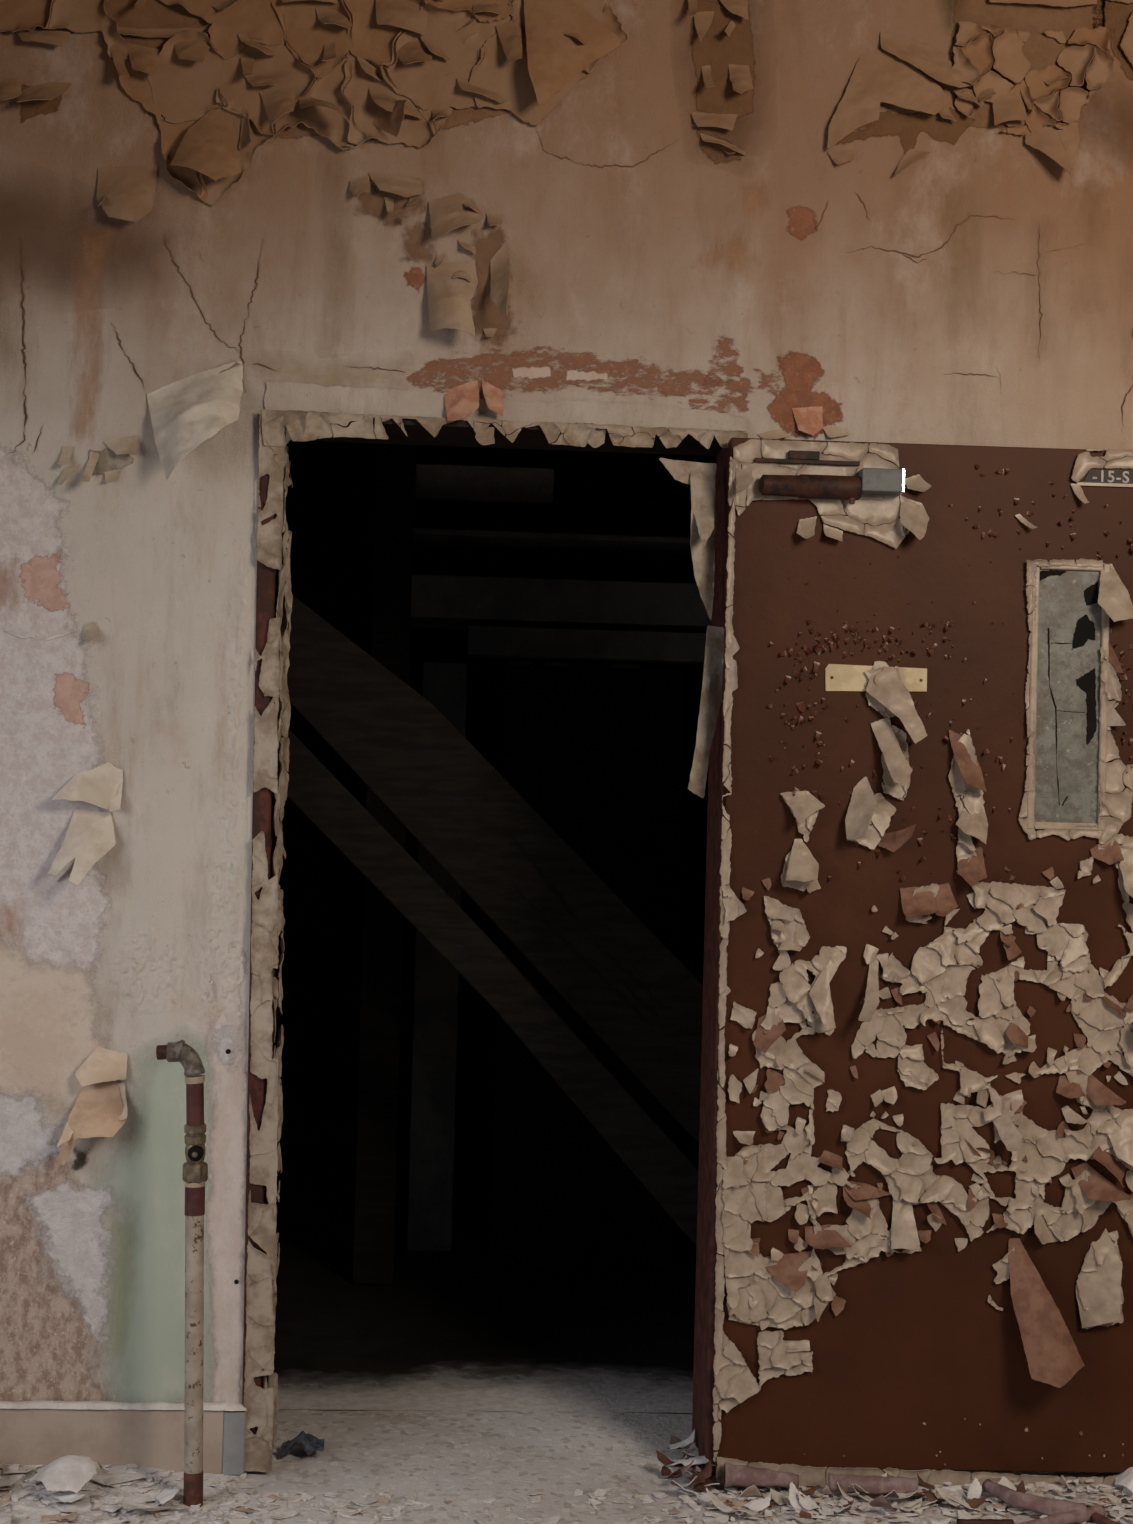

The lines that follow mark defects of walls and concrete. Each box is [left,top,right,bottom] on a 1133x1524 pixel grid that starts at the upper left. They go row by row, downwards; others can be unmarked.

peeling [0,0,628,222]
spalling [688,0,756,164]
peeling [827,0,1133,177]
crack [8,244,43,454]
crack [111,323,144,388]
crack [165,238,276,391]
crack [347,365,405,373]
peeling [0,361,243,1165]
peeling [244,172,1133,1488]